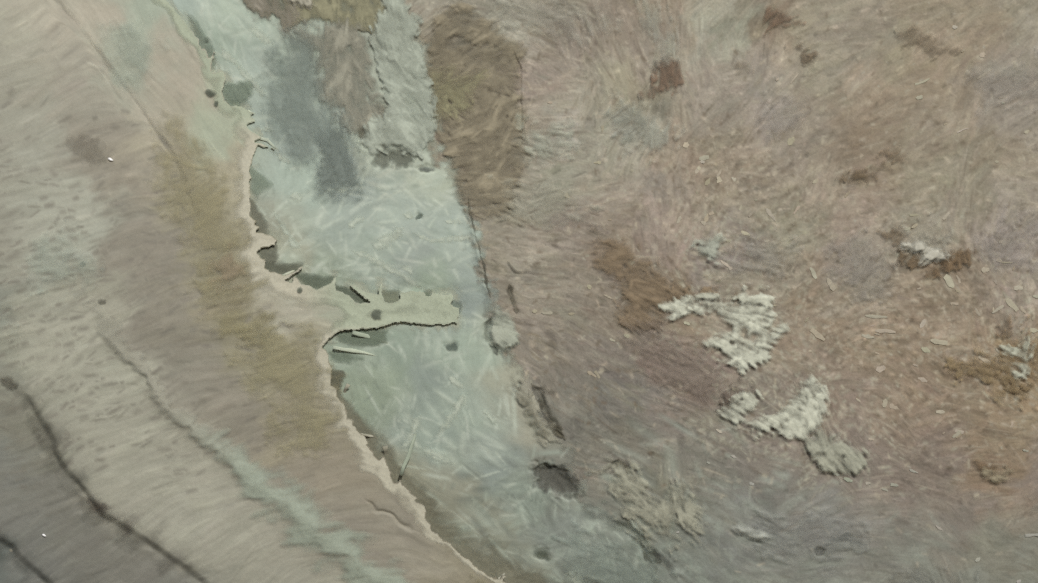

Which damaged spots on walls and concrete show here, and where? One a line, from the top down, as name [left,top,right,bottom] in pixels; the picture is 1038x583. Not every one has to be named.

flaking render [0,0,656,583]